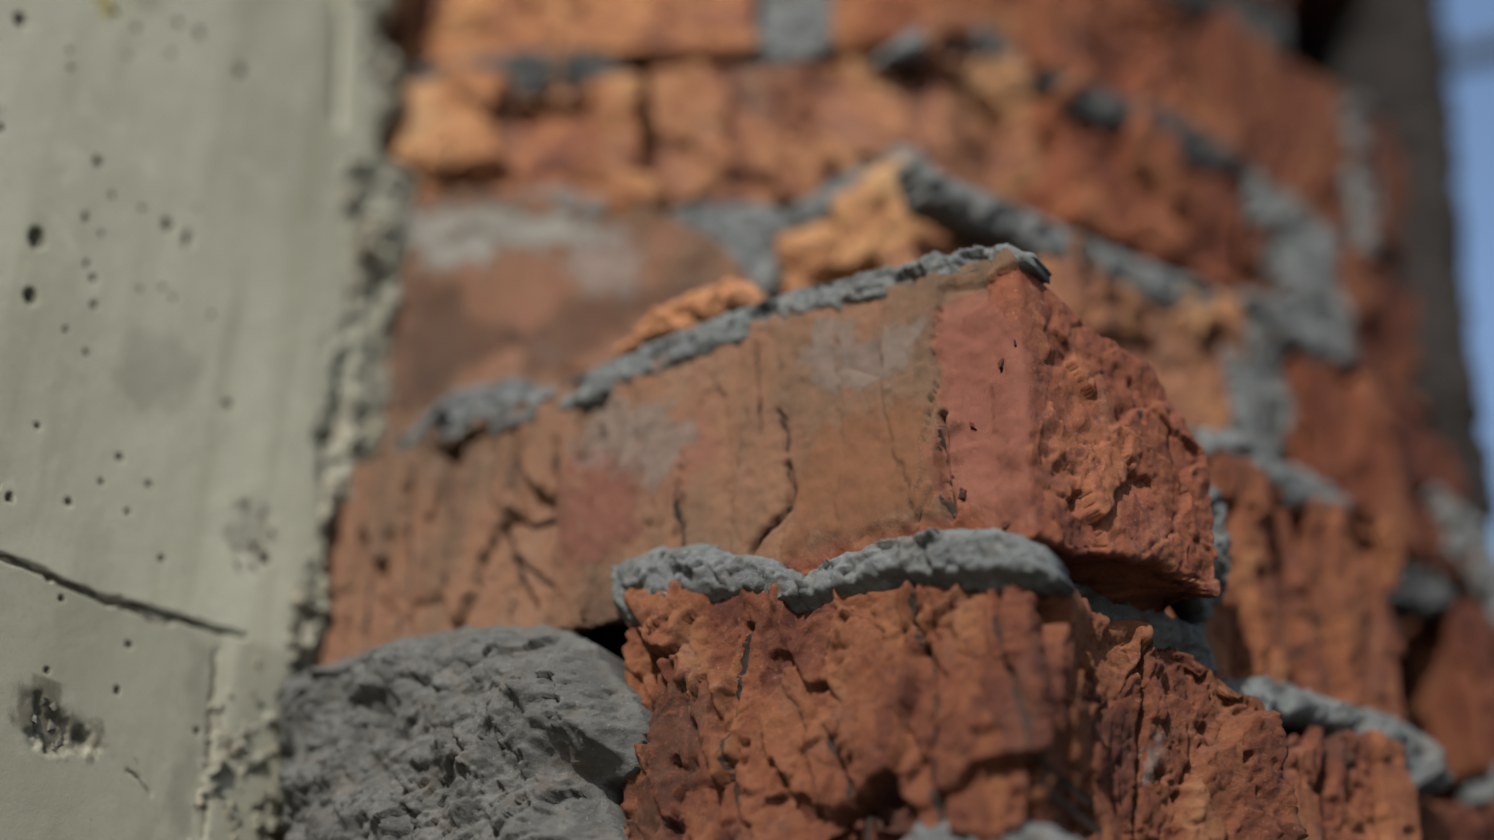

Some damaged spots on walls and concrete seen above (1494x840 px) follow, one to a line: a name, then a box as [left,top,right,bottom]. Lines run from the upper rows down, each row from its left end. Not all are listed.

crack [501,445,562,609]
crack [673,486,686,547]
crack [755,343,797,549]
crack [920,425,956,520]
spalling [11,673,103,759]
crack [0,555,246,834]